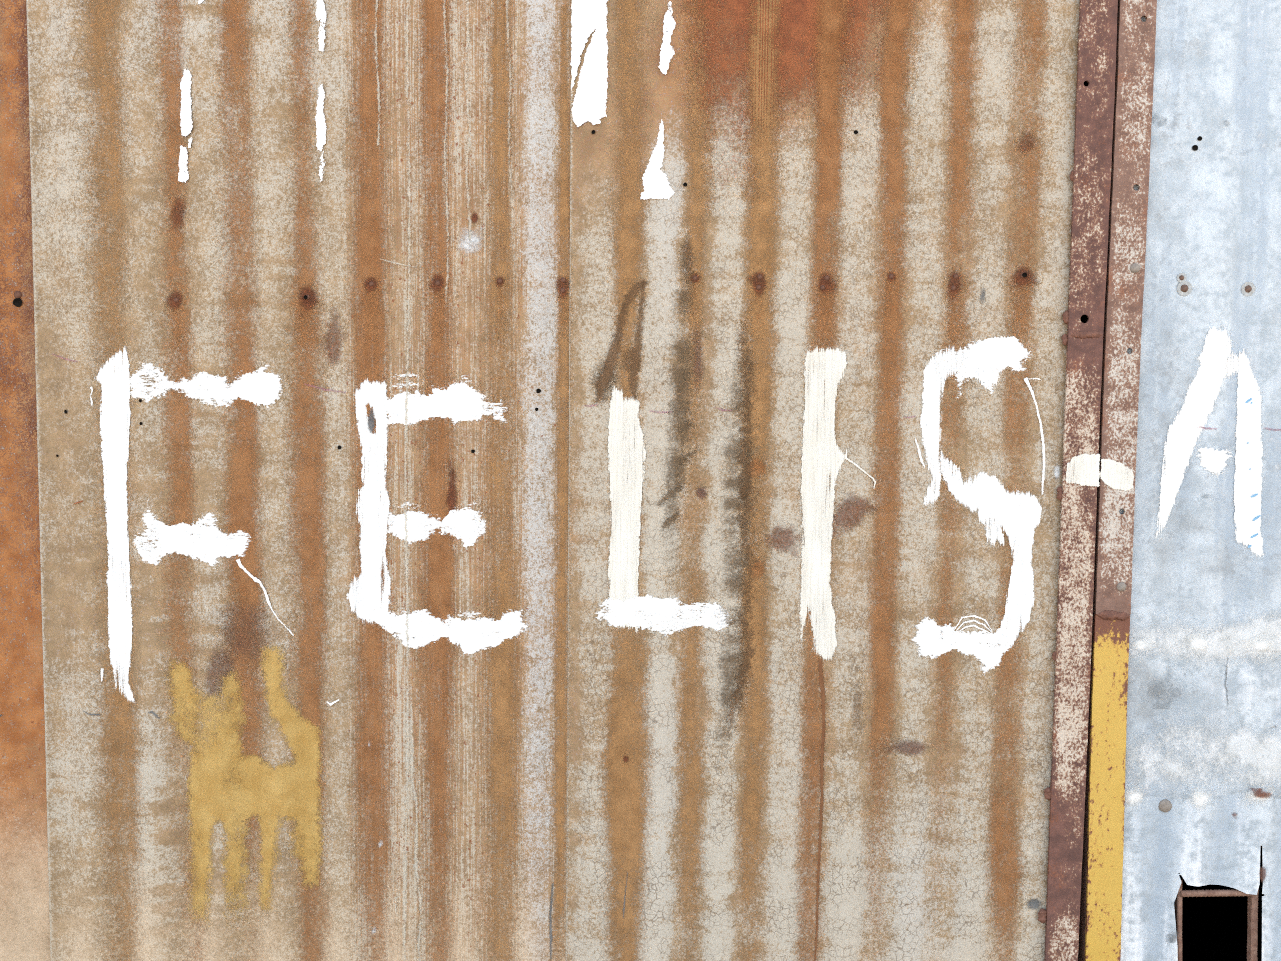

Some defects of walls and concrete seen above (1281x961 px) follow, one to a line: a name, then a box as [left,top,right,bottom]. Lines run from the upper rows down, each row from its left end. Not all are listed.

corrosion [160,0,194,526]
corrosion [212,397,264,759]
corrosion [288,0,338,961]
corrosion [352,0,387,501]
corrosion [421,0,452,394]
corrosion [421,417,456,961]
corrosion [552,5,572,952]
leakage [591,280,646,403]
corrosion [600,628,652,961]
leakage [658,244,700,528]
leakage [719,339,758,749]
corrosion [685,0,922,961]